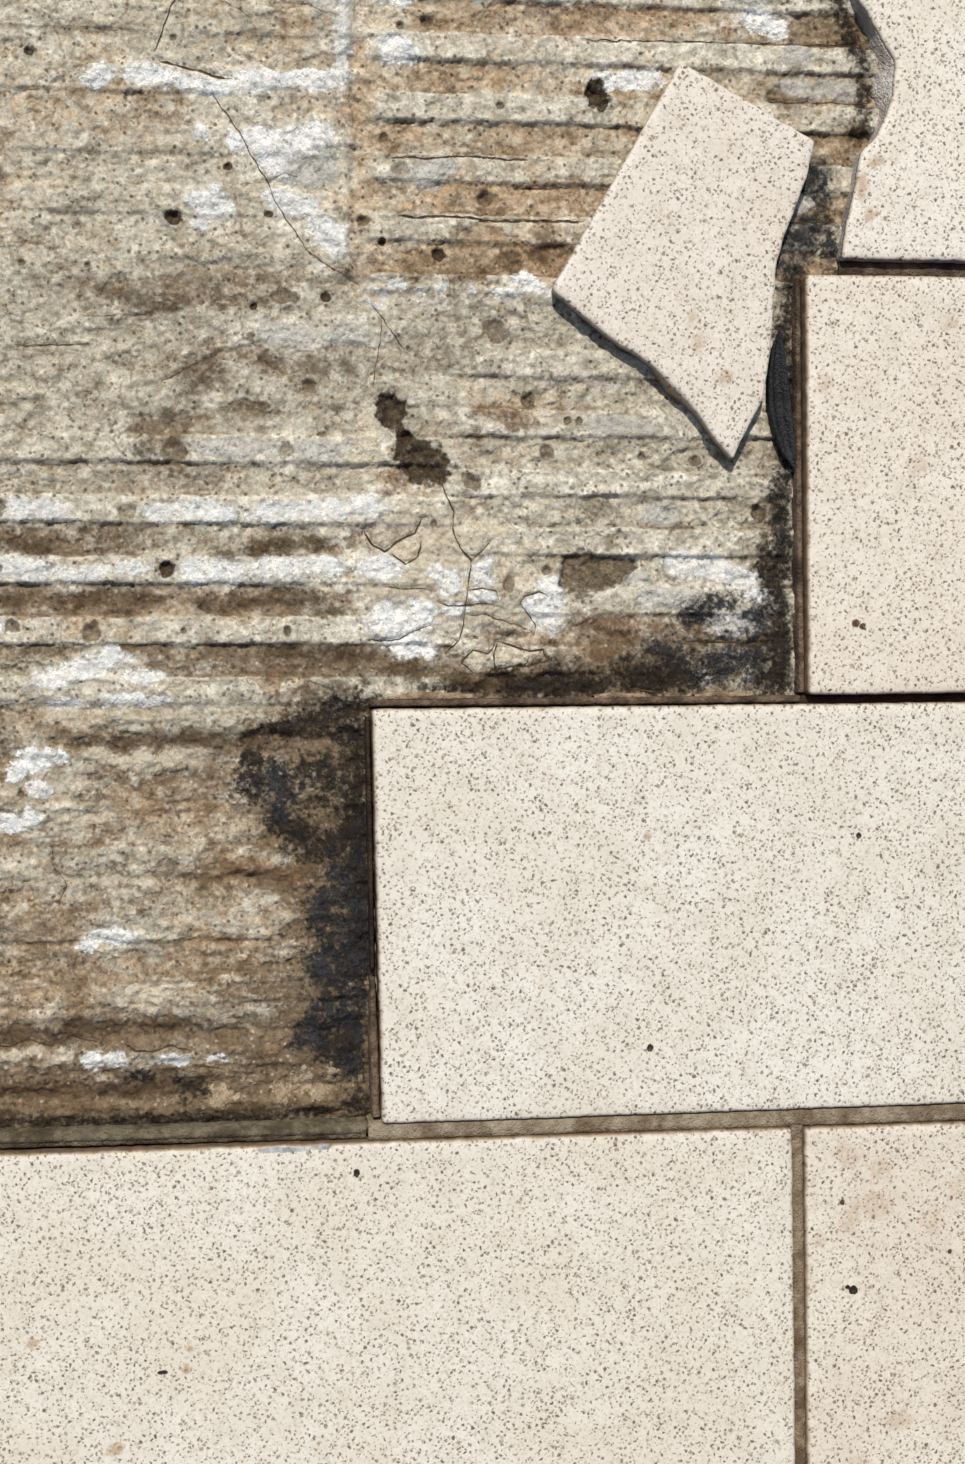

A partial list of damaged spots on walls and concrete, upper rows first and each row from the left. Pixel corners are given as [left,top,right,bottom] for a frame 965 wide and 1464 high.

hole [584,78,610,112]
efflorescence [589,66,666,94]
water stain [724,0,875,143]
spalling [164,210,183,225]
crack [154,0,405,387]
water stain [771,160,839,399]
water stain [163,360,223,419]
spalling [375,392,480,489]
spalling [159,561,175,578]
crack [364,483,548,670]
spalling [558,548,638,597]
water stain [0,391,794,1128]